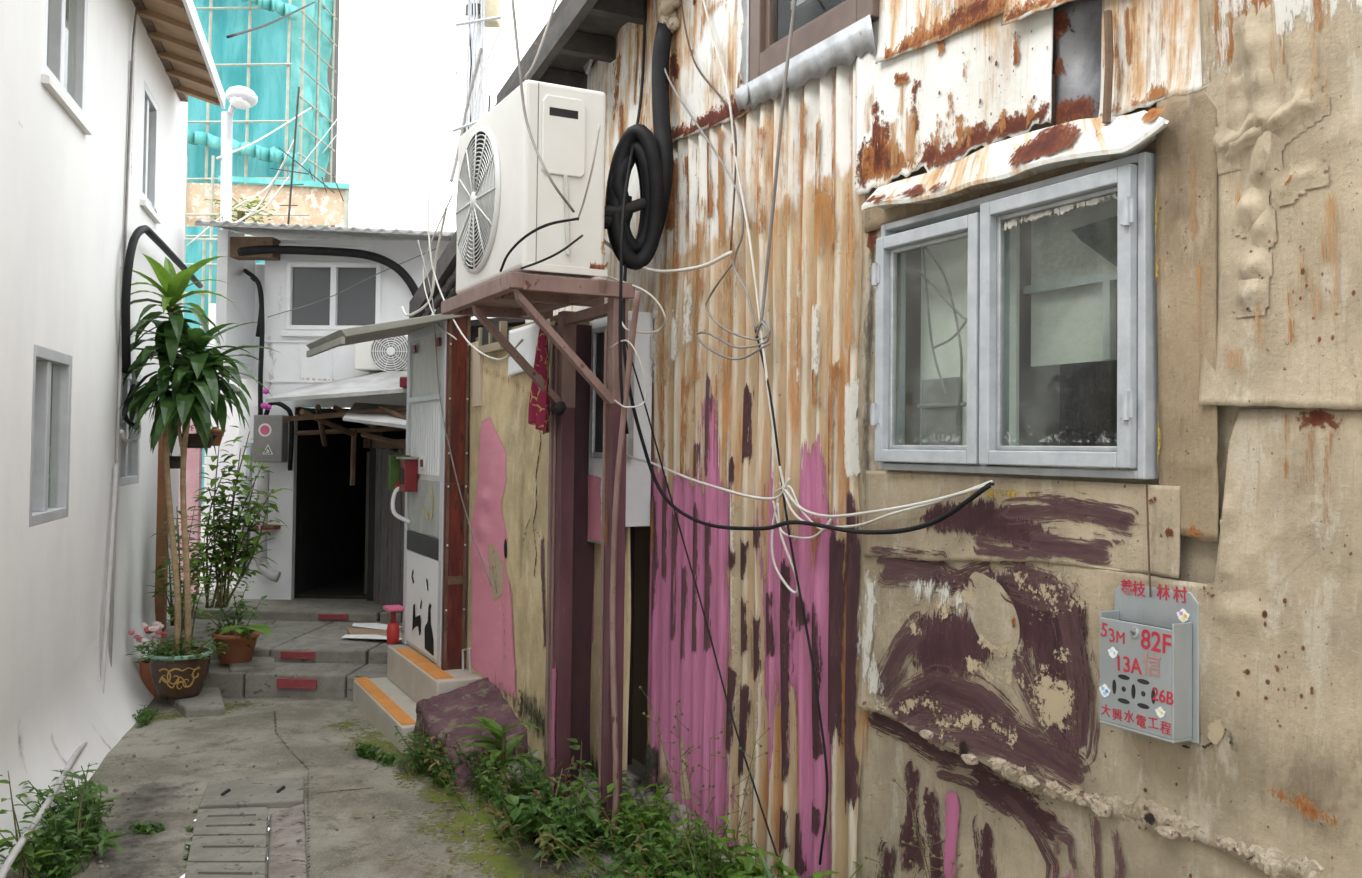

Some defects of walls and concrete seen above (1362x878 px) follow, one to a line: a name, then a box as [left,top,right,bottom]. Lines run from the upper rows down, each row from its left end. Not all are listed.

rust [1313,0,1328,32]
rust [784,0,1271,571]
rust [1284,410,1342,535]
rust [1261,787,1337,834]